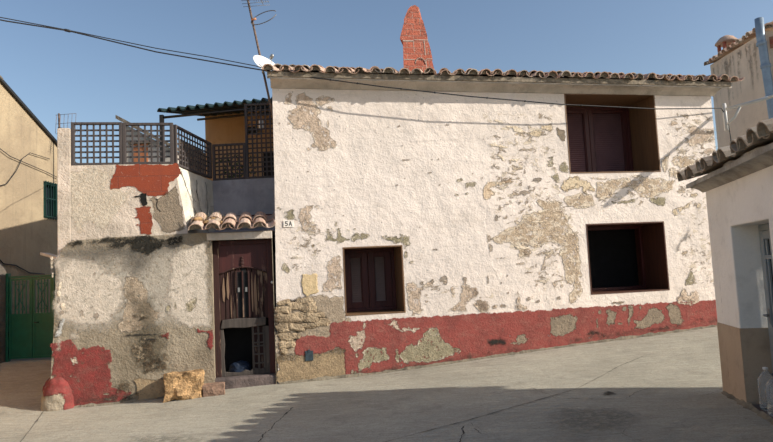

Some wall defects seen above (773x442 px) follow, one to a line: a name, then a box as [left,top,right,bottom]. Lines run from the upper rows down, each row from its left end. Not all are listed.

peeling [278,93,337,151]
peeling [277,205,370,279]
peeling [381,234,413,264]
peeling [406,111,718,329]
peeling [50,242,214,406]
flaking render [274,255,351,361]
peeling [317,319,461,374]
peeling [550,314,578,337]